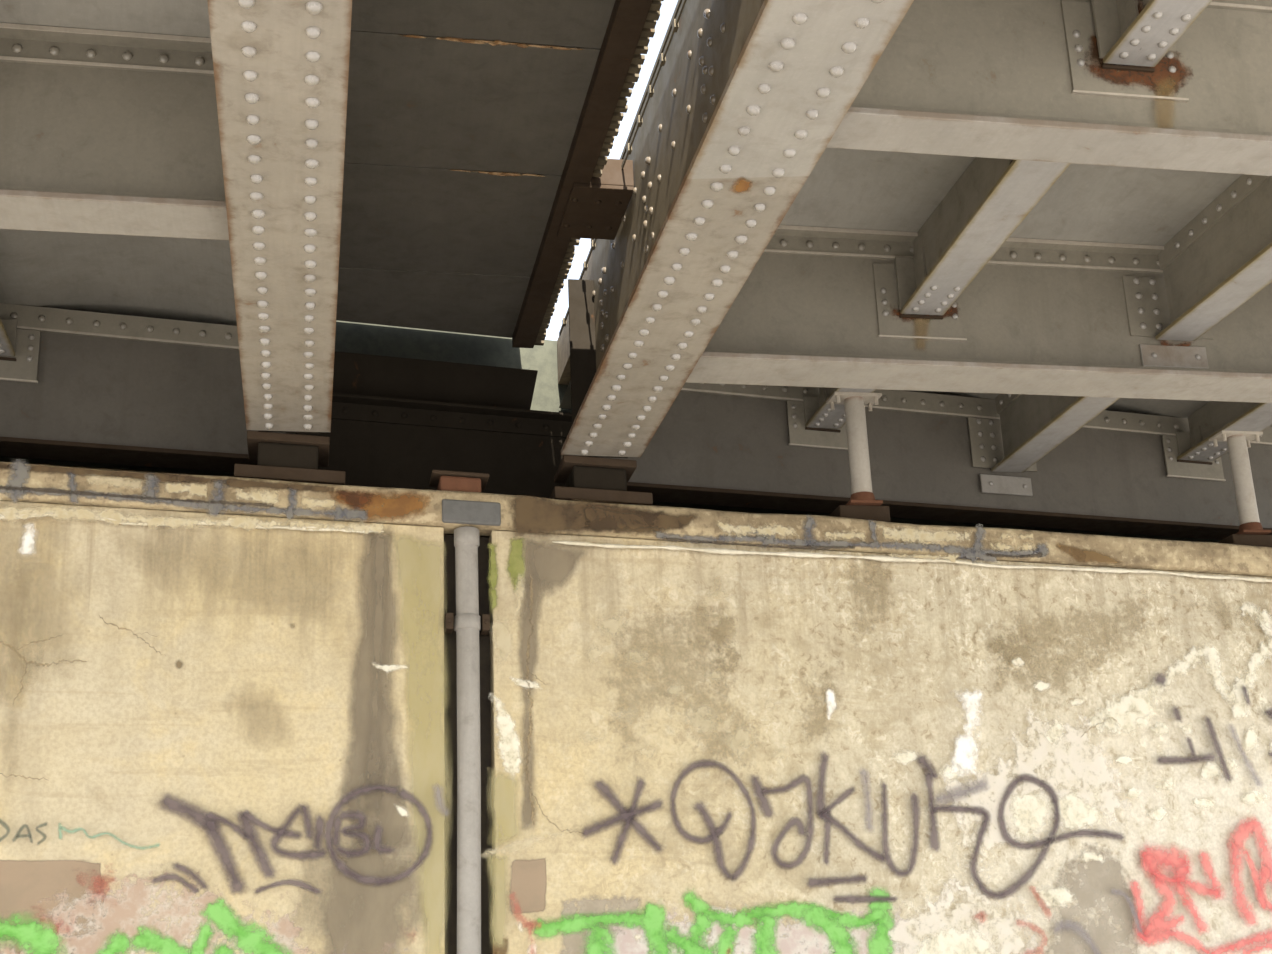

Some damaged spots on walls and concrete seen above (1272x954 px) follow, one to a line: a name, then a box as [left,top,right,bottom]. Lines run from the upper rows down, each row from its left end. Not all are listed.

rust [1085,36,1193,97]
rust [893,307,958,321]
rust [334,491,429,520]
leakage [22,526,34,554]
crack [0,636,86,700]
leakage [489,496,696,841]
leakage [321,533,447,954]
peeling [940,604,1272,857]
peeling [1082,852,1103,862]
leakage [491,857,507,954]
peeling [889,874,1038,954]
peeling [1036,888,1072,907]